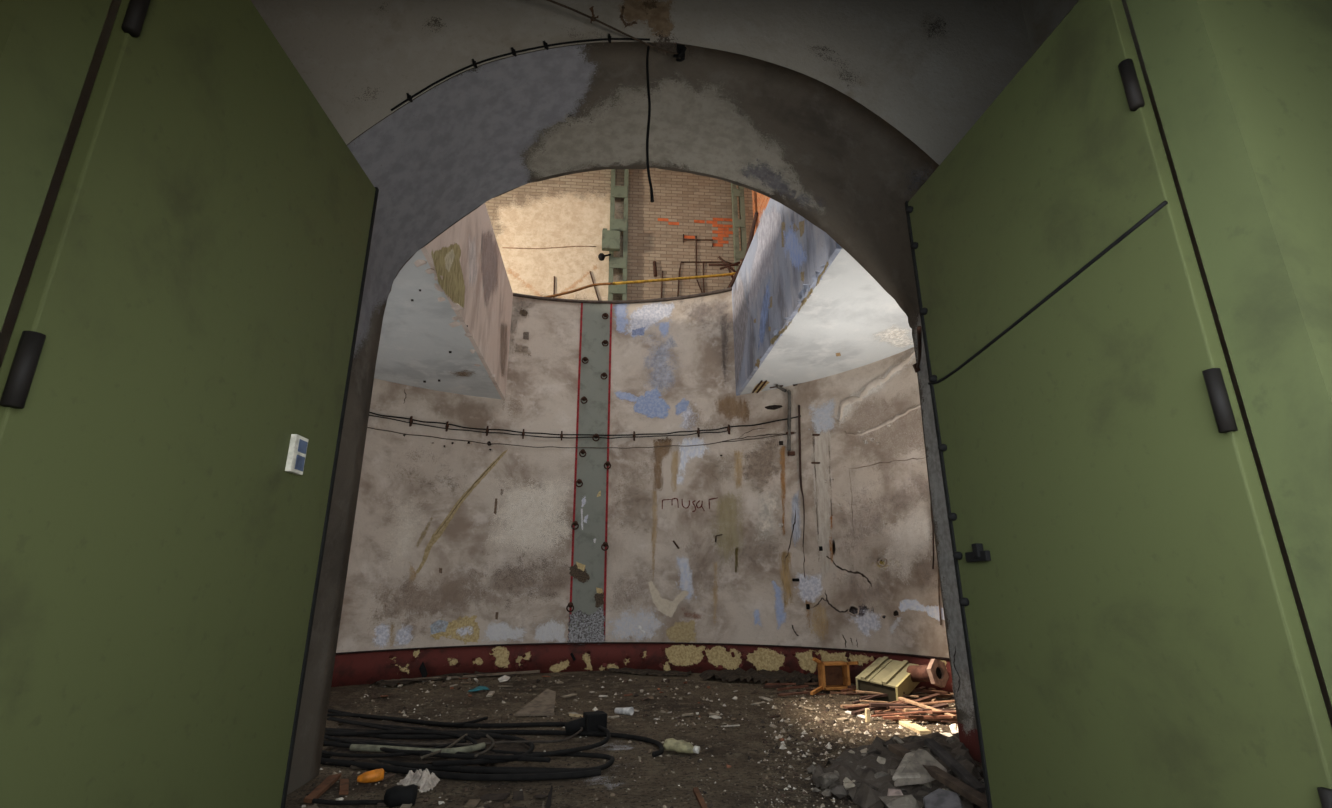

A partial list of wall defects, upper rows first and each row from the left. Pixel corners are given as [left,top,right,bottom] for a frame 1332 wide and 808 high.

peeling [522,63,839,411]
peeling [615,386,699,430]
corrosion [650,436,680,579]
peeling [389,554,876,705]